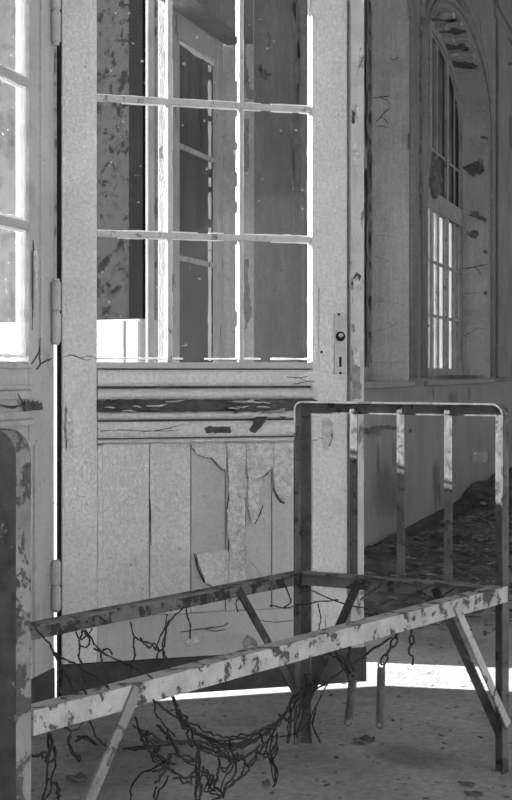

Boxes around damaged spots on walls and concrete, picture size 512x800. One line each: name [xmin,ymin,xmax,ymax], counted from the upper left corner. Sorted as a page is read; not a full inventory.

crack [374,96,391,128]
spalling [408,0,480,214]
spalling [463,158,485,177]
crack [31,346,95,370]
crack [0,394,25,409]
peeling [190,443,294,586]